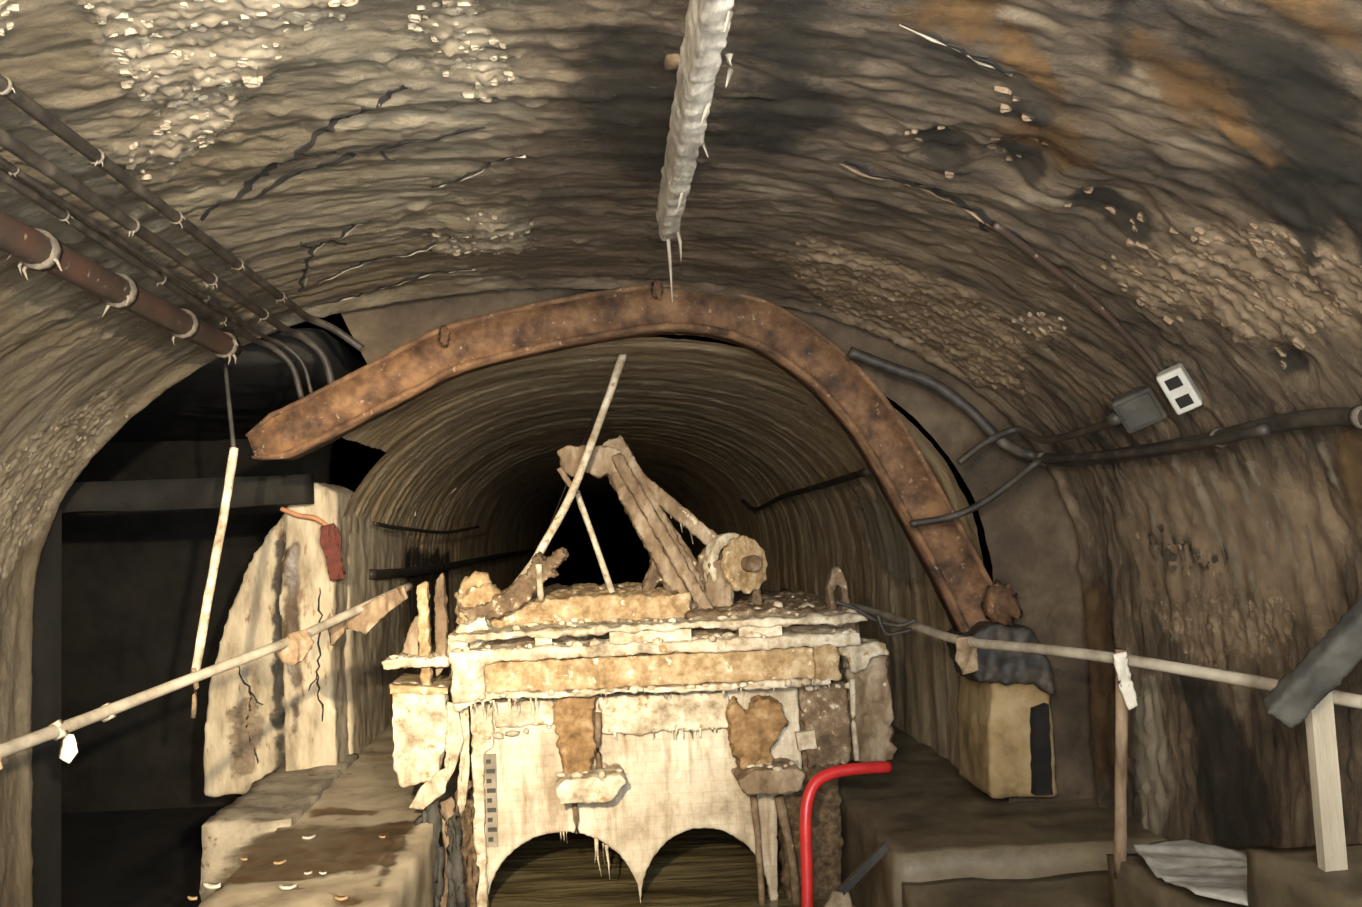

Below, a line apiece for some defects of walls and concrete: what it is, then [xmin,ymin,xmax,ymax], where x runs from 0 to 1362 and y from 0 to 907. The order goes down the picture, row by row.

damp [568,22,676,182]
damp [705,0,864,153]
damp [1185,18,1362,266]
damp [270,533,302,770]